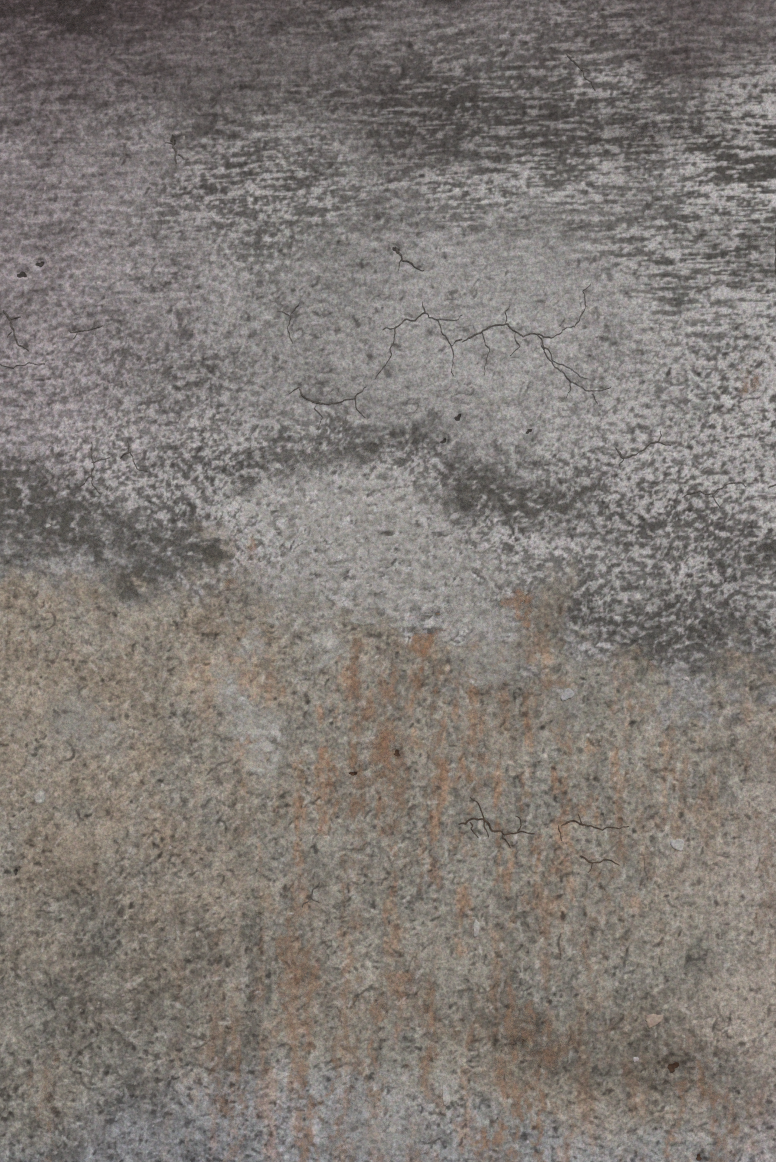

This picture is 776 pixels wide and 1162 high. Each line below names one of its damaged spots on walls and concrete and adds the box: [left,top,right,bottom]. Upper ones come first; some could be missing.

crack [395,246,425,271]
crack [290,284,611,430]
leakage [0,461,103,561]
leakage [454,469,600,527]
leakage [116,523,222,597]